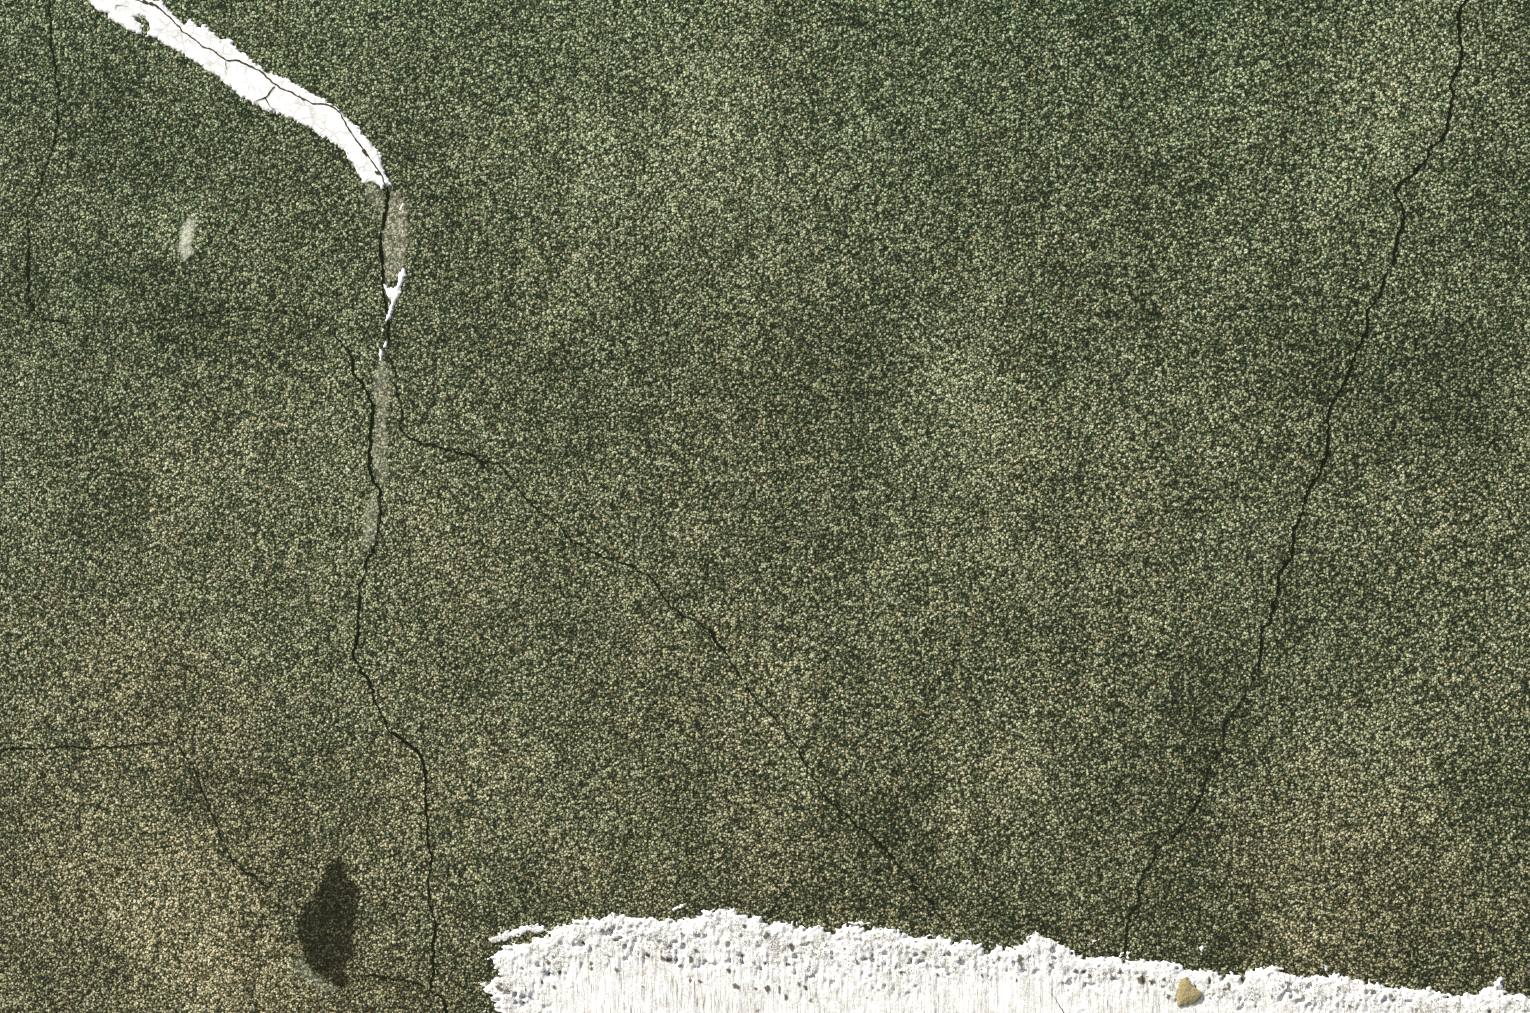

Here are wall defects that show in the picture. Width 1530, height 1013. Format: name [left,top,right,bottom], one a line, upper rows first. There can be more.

crack [1124,0,1468,953]
crack [0,0,954,1013]
water stain [299,864,355,989]
peeling [489,923,549,943]
spalling [644,949,702,983]
spalling [726,968,811,1002]
flaking render [1117,949,1245,1007]